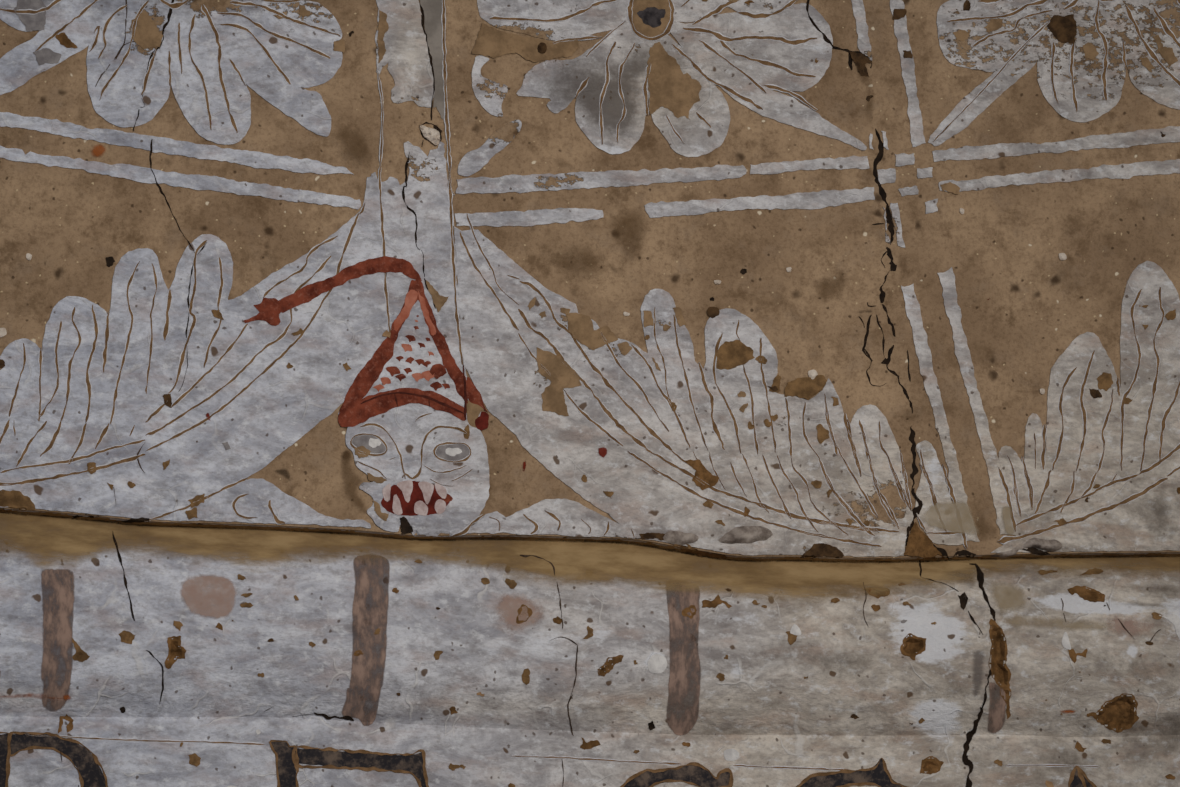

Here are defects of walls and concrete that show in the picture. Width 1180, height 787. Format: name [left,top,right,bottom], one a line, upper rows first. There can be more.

crack [806,0,872,70]
spalling [1047,14,1099,60]
crack [402,3,436,309]
crack [95,0,207,391]
spalling [716,340,767,370]
spalling [768,374,839,406]
crack [859,129,996,634]
spalling [868,582,906,611]
spalling [1067,568,1106,606]
spalling [900,620,926,660]
crack [962,670,992,787]
spalling [1087,693,1139,744]